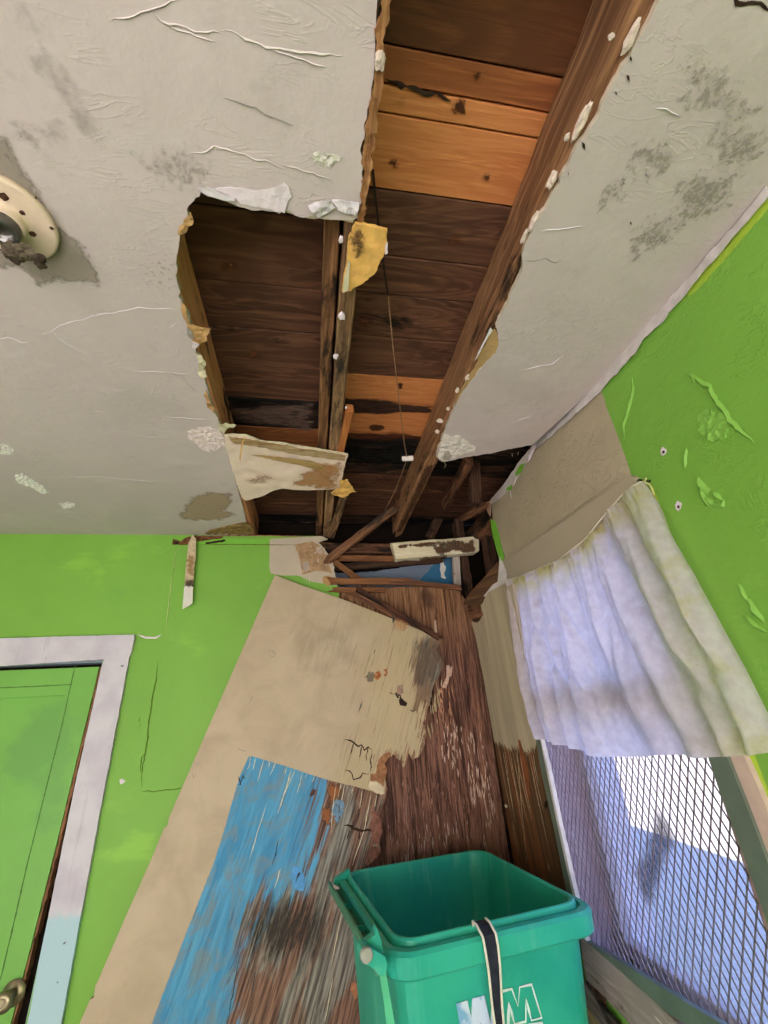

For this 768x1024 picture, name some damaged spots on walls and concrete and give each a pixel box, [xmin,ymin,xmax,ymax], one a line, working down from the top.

crack [110,0,342,67]
peeling [198,182,292,213]
peeling [308,199,359,218]
peeling [187,427,225,453]
peeling [438,434,476,468]
leakage [180,492,232,520]
peeling [486,445,535,561]
crack [140,667,181,792]
crack [345,739,372,780]